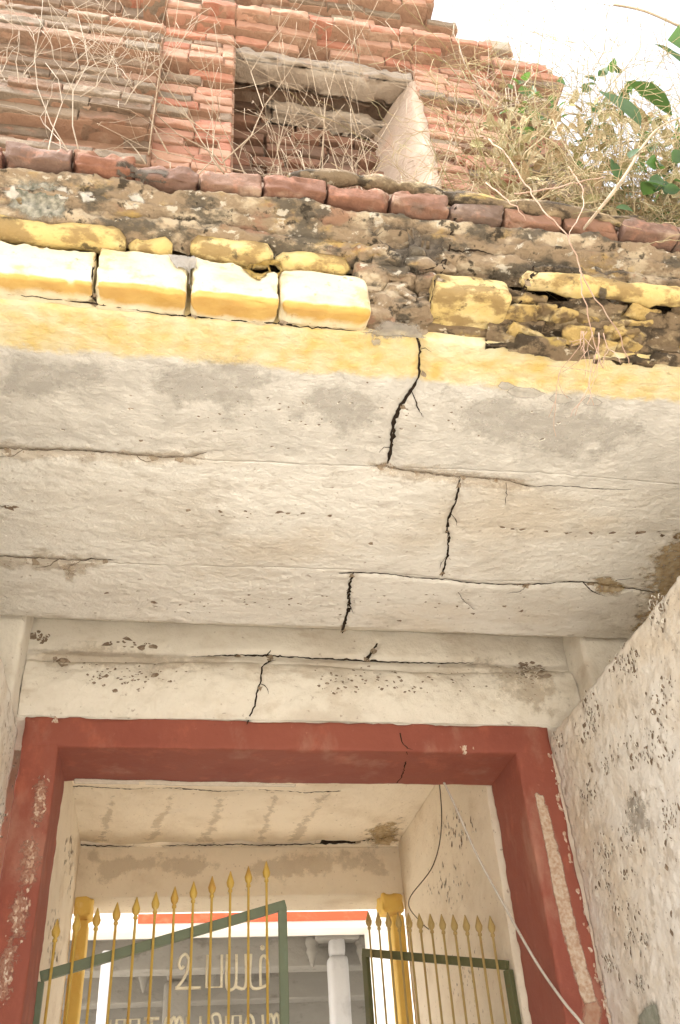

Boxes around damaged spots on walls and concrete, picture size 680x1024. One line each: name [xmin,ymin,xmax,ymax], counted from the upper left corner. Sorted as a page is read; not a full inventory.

spalling [352,244,457,331]
spalling [485,288,680,368]
crack [340,206,655,633]
crack [192,643,474,724]
spalling [0,775,50,1005]
crack [167,828,396,846]
flaking render [535,731,649,1024]